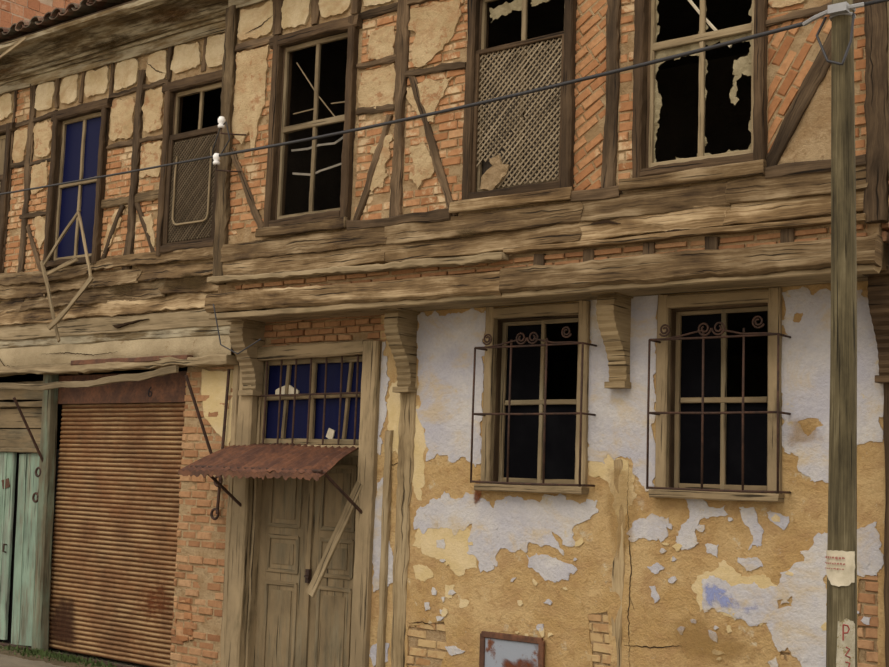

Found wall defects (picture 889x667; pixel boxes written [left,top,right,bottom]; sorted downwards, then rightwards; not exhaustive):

peeling [857,289,884,445]
peeling [369,643,390,666]
peeling [405,308,599,667]
crack [624,464,686,665]
peeling [587,286,831,667]
spalling [857,522,884,667]